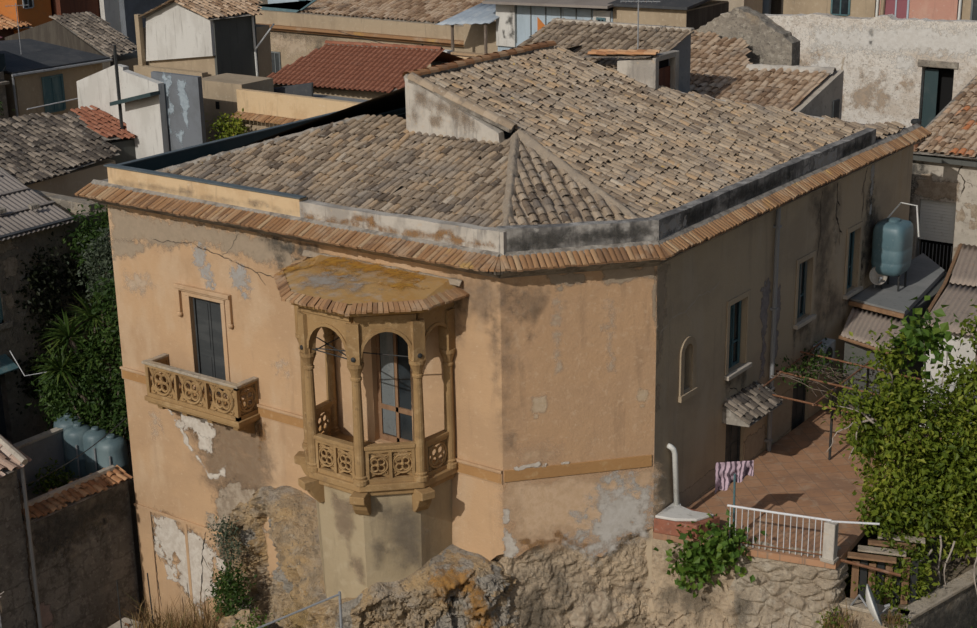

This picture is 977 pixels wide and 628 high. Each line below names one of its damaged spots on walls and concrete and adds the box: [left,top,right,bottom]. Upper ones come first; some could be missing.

crack [153,236,272,283]
crack [816,168,868,256]
water stain [862,164,876,275]
flaking render [914,174,977,230]
peeling [154,409,255,619]
flaking render [502,509,519,558]
flaking render [563,470,657,557]